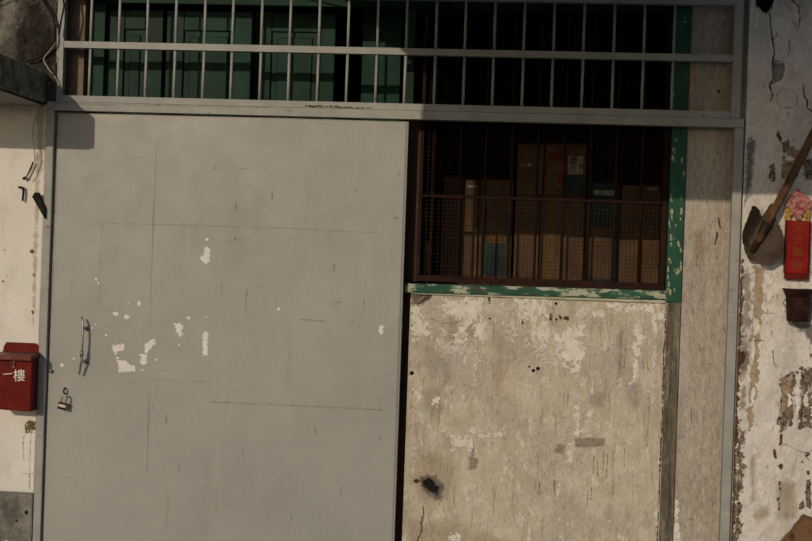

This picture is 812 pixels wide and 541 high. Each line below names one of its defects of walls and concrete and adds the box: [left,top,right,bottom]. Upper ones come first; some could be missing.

spalling [758,0,774,12]
crack [765,12,790,102]
spalling [773,62,784,84]
spalling [768,131,812,182]
spalling [666,234,682,295]
peeling [409,294,666,405]
peeling [747,259,780,431]
spalling [777,354,812,433]